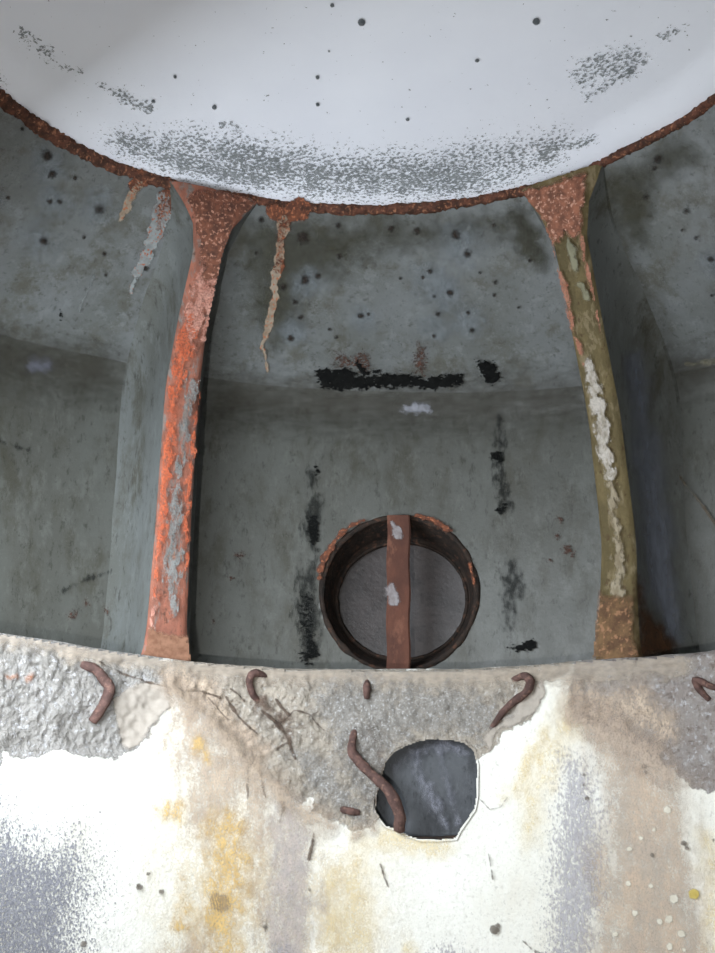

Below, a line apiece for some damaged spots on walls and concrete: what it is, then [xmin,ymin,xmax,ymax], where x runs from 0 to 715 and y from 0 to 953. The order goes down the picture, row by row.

peeling [566,43,652,103]
peeling [98,83,598,206]
rust [0,89,715,376]
rust [143,625,191,661]
damp [303,466,320,551]
rust [317,519,365,580]
peeling [386,583,400,606]
damp [219,383,585,514]
rust [592,585,674,659]
damp [630,357,678,638]
spalling [0,633,715,833]
damp [0,562,715,953]